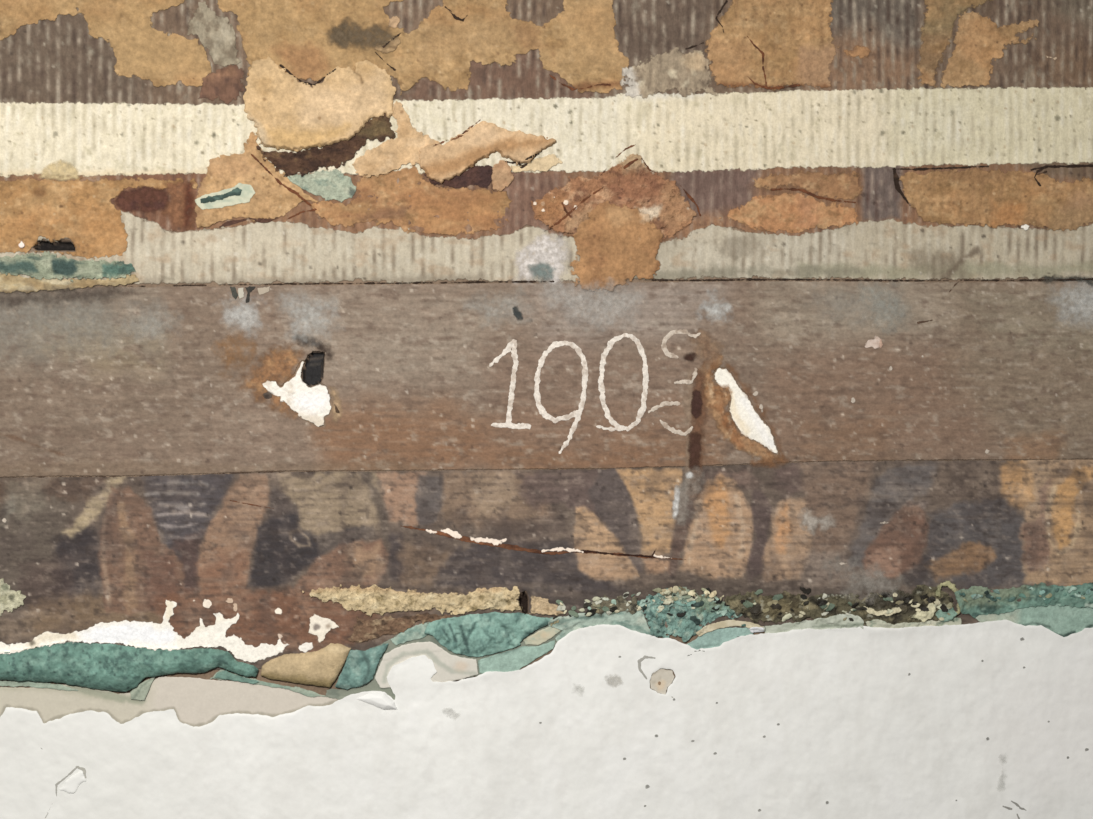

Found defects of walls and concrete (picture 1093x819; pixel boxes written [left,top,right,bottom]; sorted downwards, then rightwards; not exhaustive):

flaking render [917,0,1039,88]
flaking render [0,0,870,293]
flaking render [899,167,1093,231]
flaking render [245,336,341,427]
flaking render [700,355,784,467]
crack [403,526,682,560]
peeling [0,584,564,710]
spalling [638,656,674,698]
peeling [637,581,1093,656]